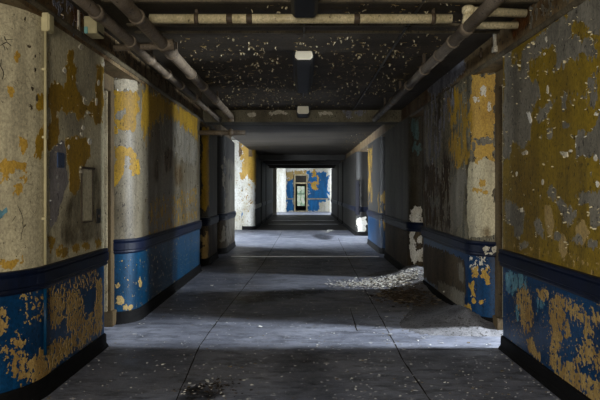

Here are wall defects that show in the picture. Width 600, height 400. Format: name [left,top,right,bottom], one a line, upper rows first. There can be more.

peeling [0,44,105,227]
peeling [110,39,210,235]
peeling [190,28,442,119]
peeling [409,0,600,239]
peeling [0,269,104,387]
peeling [115,277,161,310]
peeling [219,142,256,245]
peeling [286,169,330,212]
flaking render [409,232,496,311]
flaking render [503,171,600,275]
peeling [504,270,600,400]